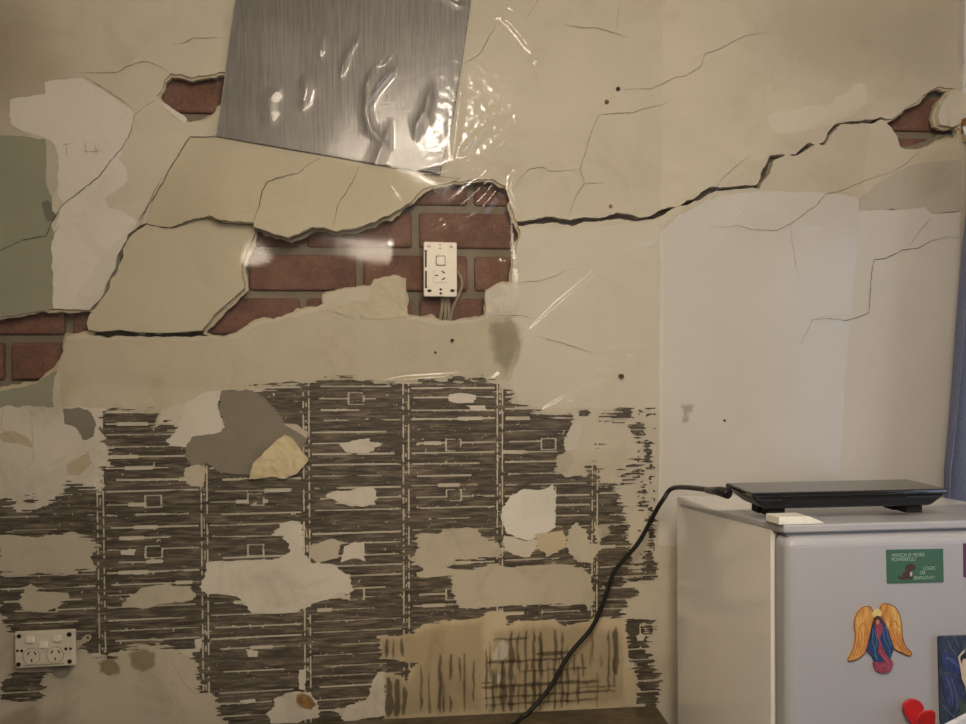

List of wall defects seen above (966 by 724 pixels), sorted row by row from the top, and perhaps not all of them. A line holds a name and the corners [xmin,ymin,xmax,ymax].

crack [0,61,161,251]
crack [136,135,320,228]
crack [515,32,877,226]
flaking render [885,0,966,150]
crack [95,329,210,338]
peeling [0,73,961,546]
crack [801,218,956,343]
flaking render [0,529,101,612]
flaking render [122,520,366,614]
flaking render [335,485,645,721]
flaking render [0,614,227,724]
flaking render [266,669,321,724]